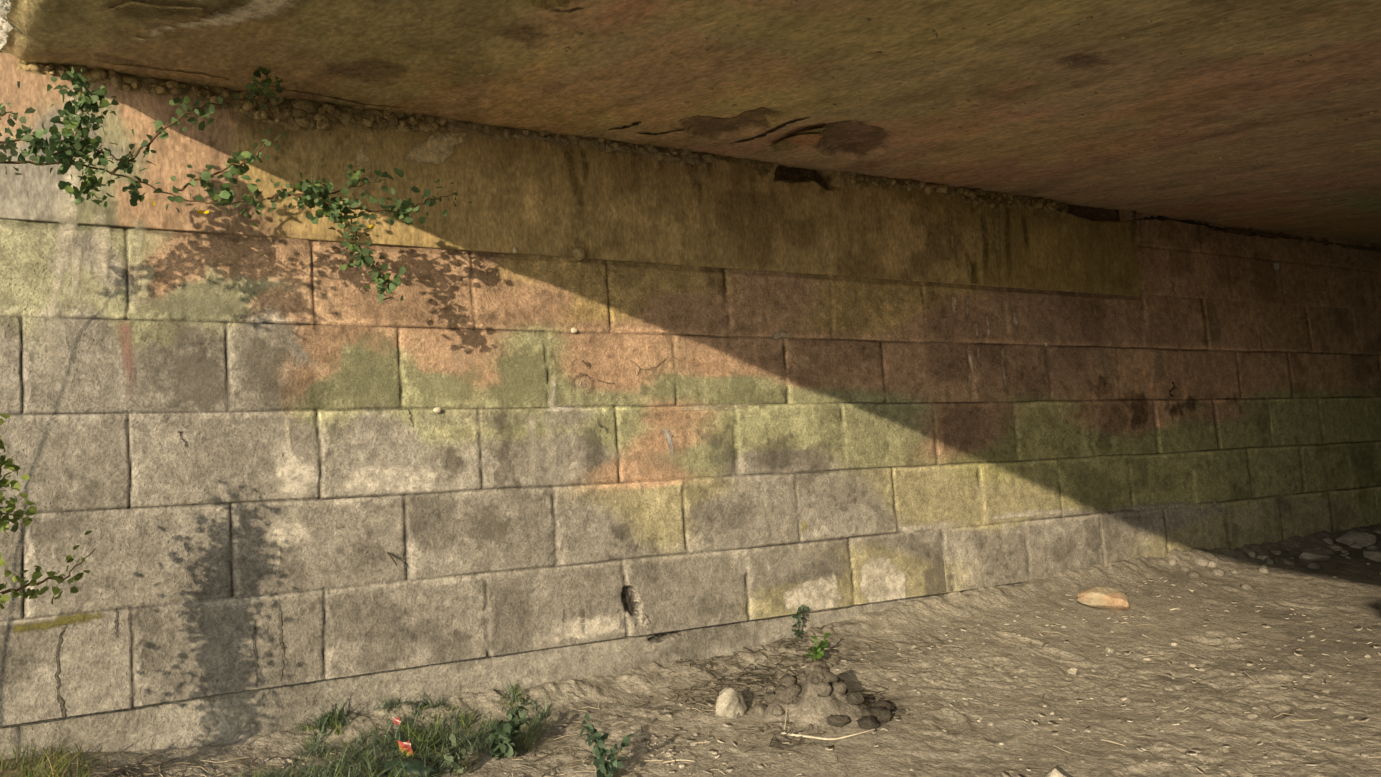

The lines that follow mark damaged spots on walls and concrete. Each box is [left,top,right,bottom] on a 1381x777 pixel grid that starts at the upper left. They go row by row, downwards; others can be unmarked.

water stain [109,0,290,41]
spalling [16,59,1381,252]
water stain [529,381,601,470]
water stain [924,556,953,598]
crack [54,627,65,717]